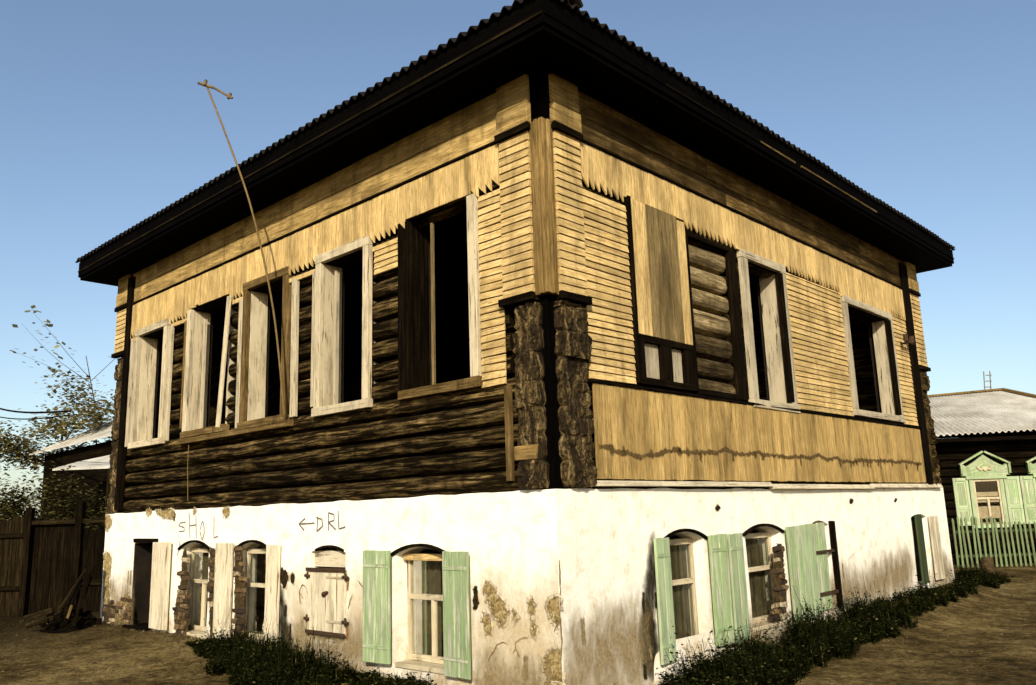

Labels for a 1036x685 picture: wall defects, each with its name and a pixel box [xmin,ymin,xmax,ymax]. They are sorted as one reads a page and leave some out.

peeling [146,506,176,522]
flaking render [102,550,134,626]
flaking render [172,548,191,636]
flaking render [206,546,216,638]
flaking render [231,545,247,639]
peeling [472,580,566,685]
water stain [571,542,659,685]
flaking render [769,543,789,622]